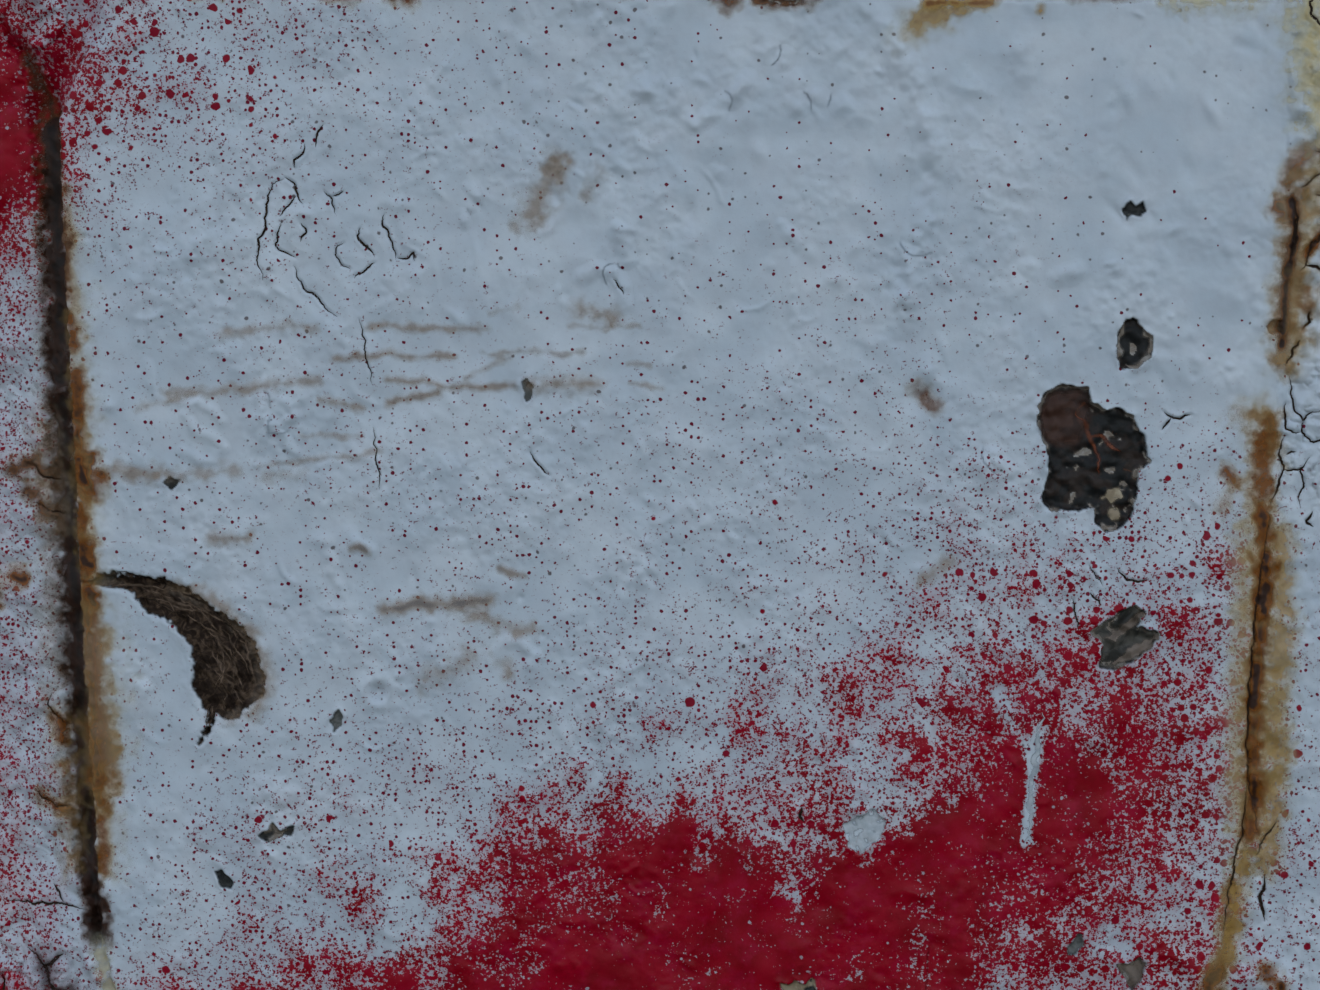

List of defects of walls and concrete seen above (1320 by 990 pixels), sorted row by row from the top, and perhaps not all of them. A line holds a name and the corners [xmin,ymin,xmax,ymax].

rust [909,0,994,32]
crack [256,125,415,381]
peeling [1111,314,1158,373]
rust [1269,142,1320,374]
crack [1289,151,1320,271]
rust [6,54,123,945]
spalling [1030,377,1159,538]
spalling [81,570,266,745]
crack [1073,565,1144,628]
peeling [1084,599,1164,675]
rust [1220,412,1281,841]
crack [1223,312,1320,931]